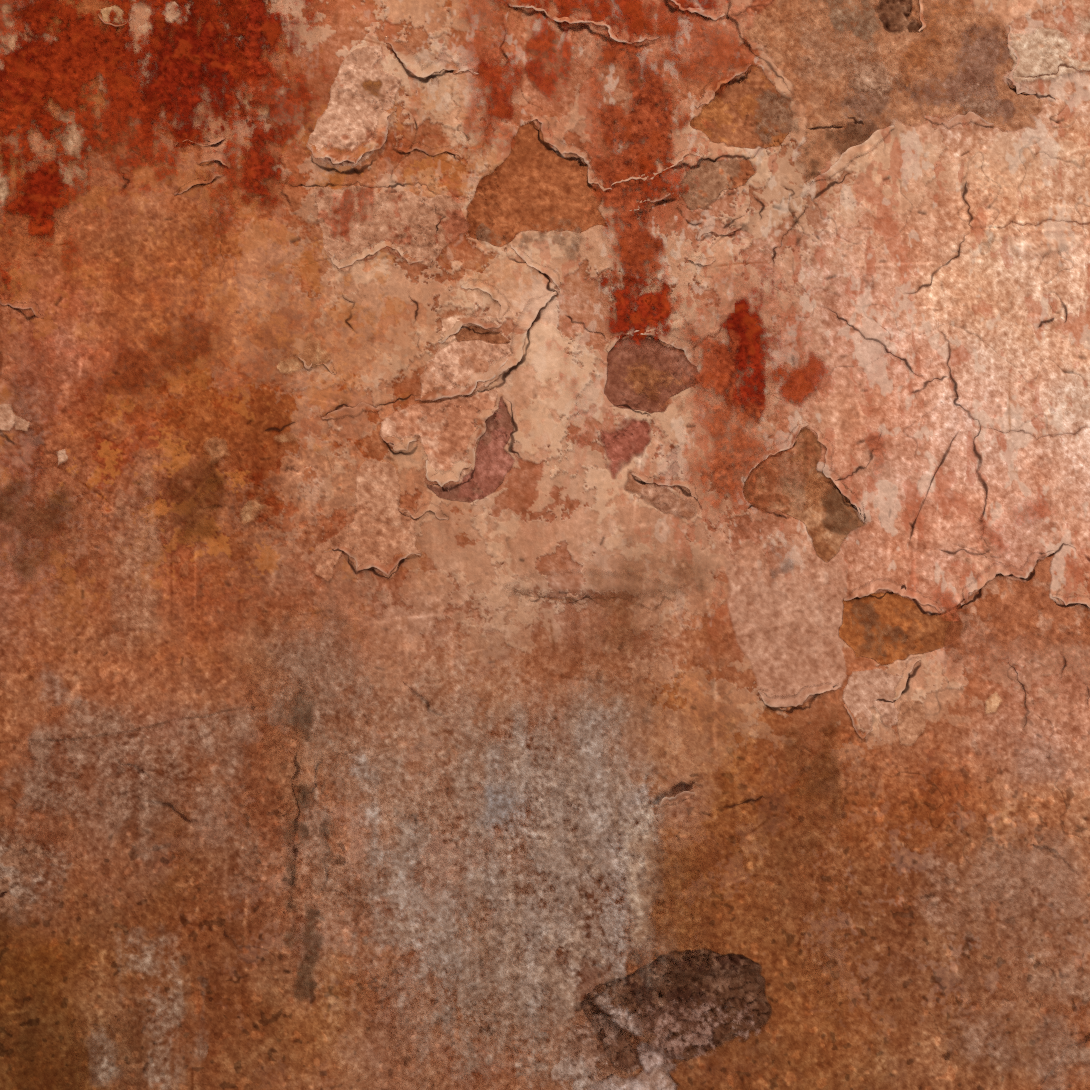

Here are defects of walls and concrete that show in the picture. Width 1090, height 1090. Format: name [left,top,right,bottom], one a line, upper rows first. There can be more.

rust [0,0,313,262]
peeling [241,500,263,523]
rust [478,0,750,345]
peeling [277,0,1090,581]
rust [691,281,830,506]
crack [832,311,1041,554]
crack [911,184,973,294]
crack [1039,303,1067,327]
peeling [758,543,1090,746]
damp [376,822,469,980]
damp [453,702,661,1016]
spalling [551,949,771,1090]